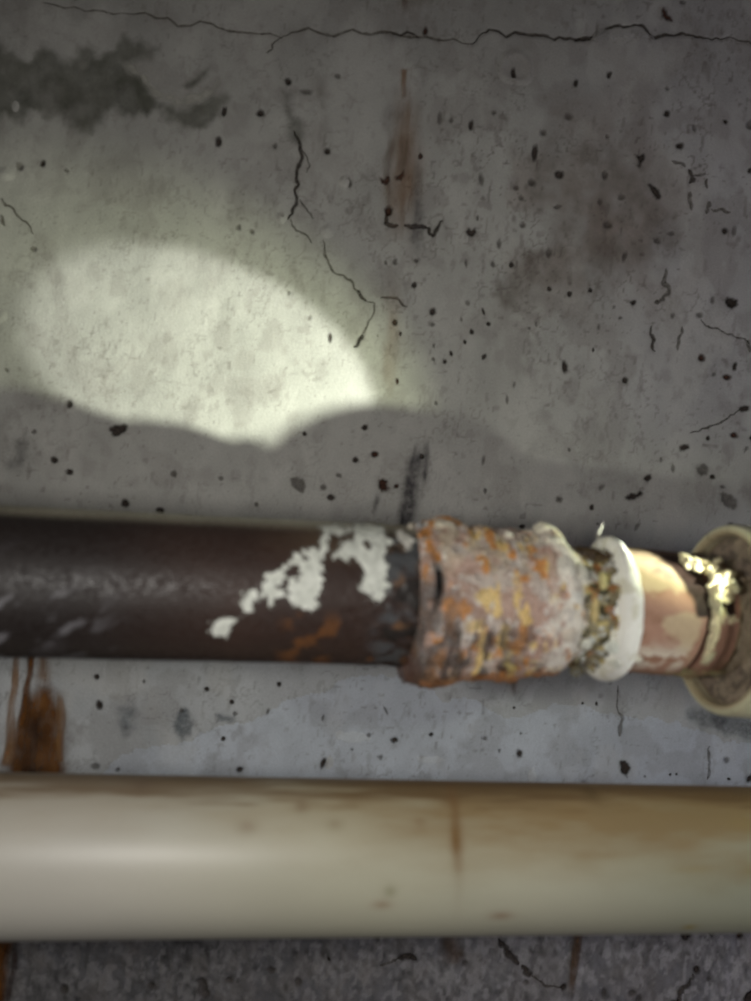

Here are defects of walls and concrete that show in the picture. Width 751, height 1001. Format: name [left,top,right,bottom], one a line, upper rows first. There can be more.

crack [46,3,751,53]
damp [0,46,213,127]
crack [287,130,408,348]
rust [3,658,64,773]
rust [0,942,17,1001]